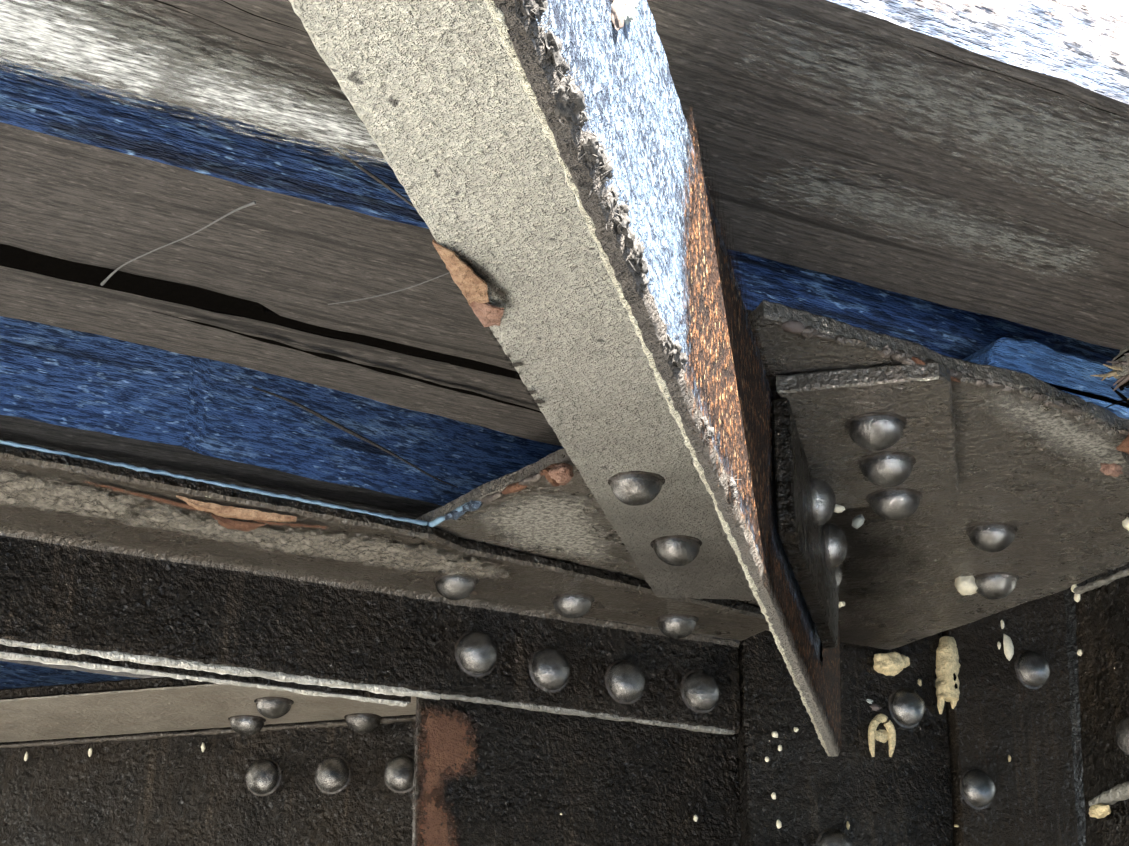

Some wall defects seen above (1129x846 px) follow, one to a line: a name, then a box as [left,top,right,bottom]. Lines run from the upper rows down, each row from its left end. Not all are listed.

crack [0,244,543,414]
peeling [432,240,524,376]
peeling [86,481,327,532]
rust [417,707,477,846]